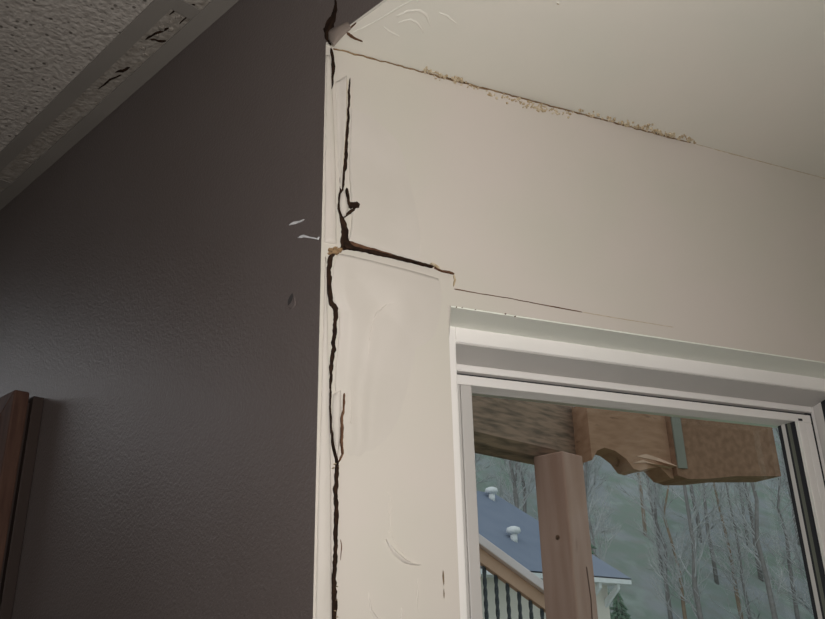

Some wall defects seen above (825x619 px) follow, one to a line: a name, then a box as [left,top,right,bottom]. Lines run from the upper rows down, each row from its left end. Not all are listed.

crack [323,0,825,619]